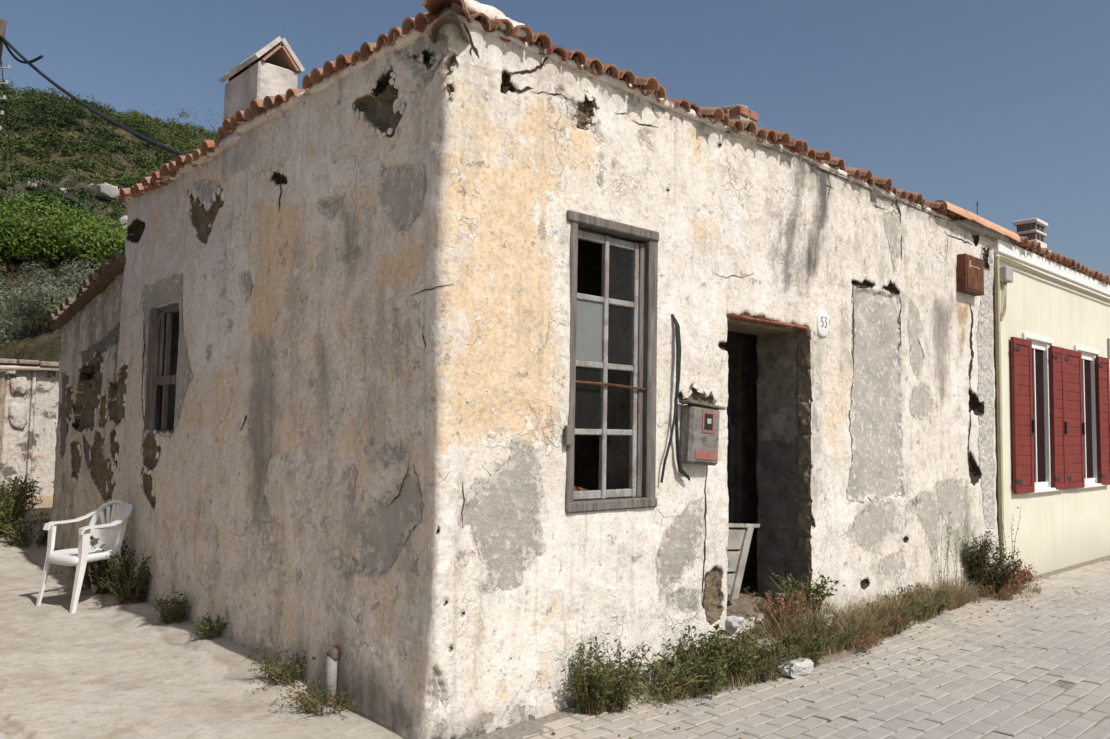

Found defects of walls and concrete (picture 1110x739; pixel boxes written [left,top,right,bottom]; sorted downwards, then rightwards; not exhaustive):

flaking render [352,30,460,139]
crack [500,57,571,100]
flaking render [560,91,618,194]
flaking render [185,178,225,247]
water stain [807,169,829,276]
peeling [60,274,193,519]
crack [968,304,984,486]
flaking render [972,232,996,529]
peeling [332,440,424,578]
peeling [454,438,546,595]
peeling [656,497,706,613]
crack [702,475,724,624]